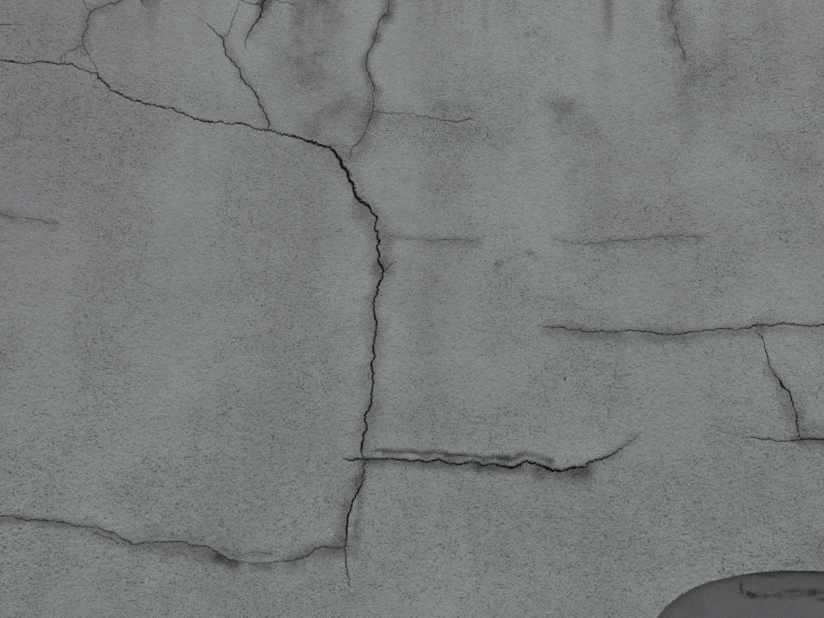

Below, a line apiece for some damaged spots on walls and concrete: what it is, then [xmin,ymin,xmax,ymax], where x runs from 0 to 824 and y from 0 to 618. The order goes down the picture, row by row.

crack [0,0,629,592]
crack [546,321,824,442]